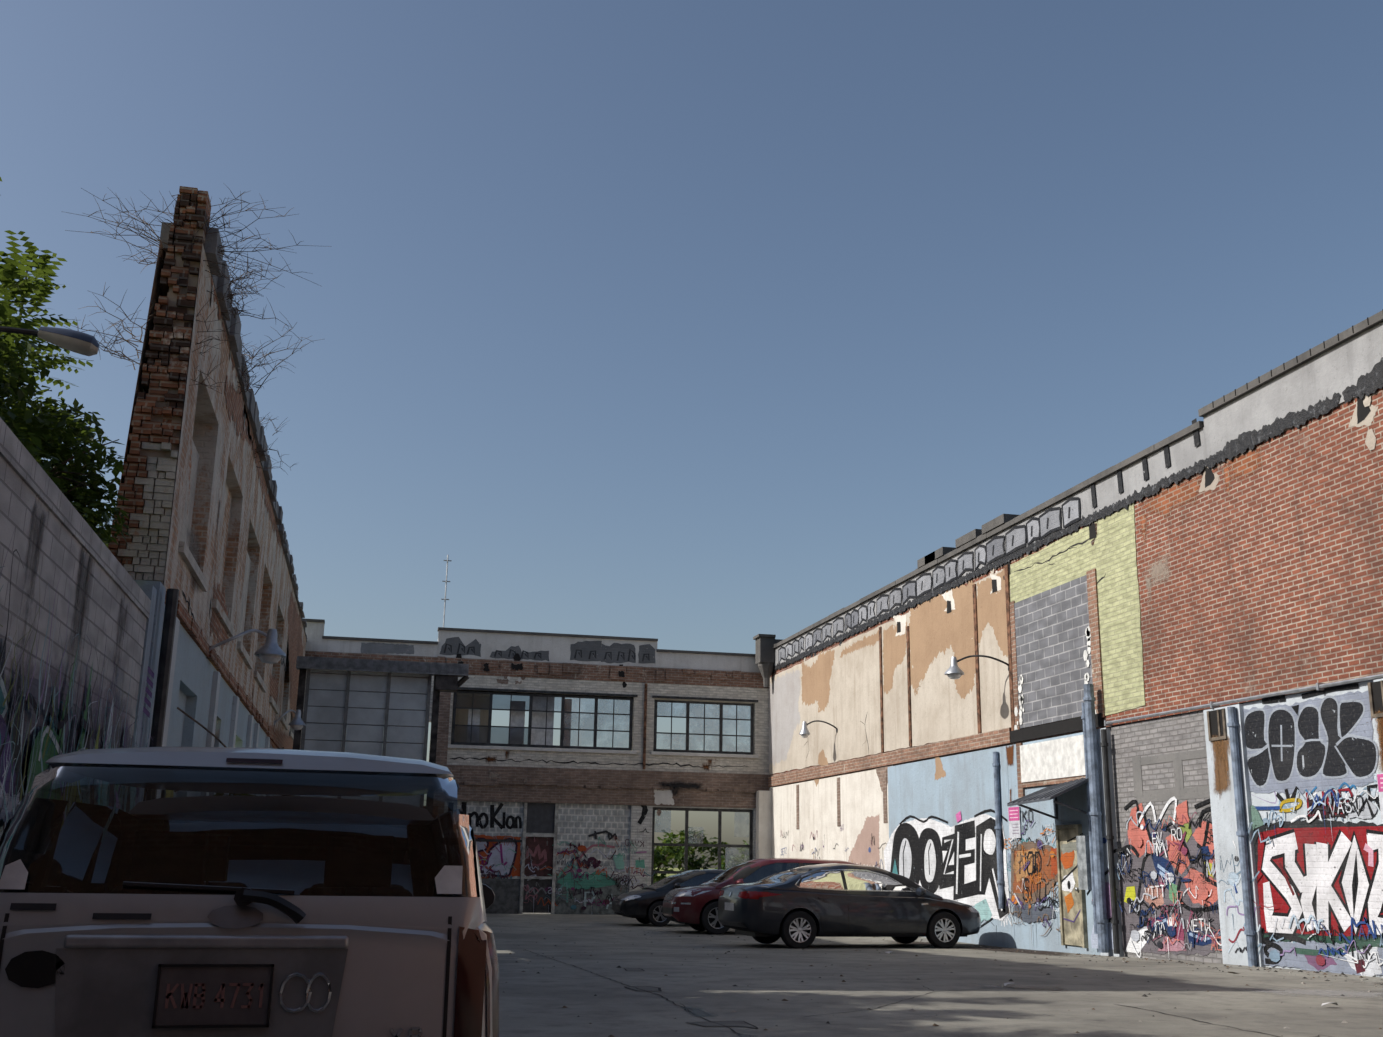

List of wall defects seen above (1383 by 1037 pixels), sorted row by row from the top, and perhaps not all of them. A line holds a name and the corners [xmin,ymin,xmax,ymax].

spalling [1348,393,1378,450]
spalling [235,562,1010,766]
peeling [935,756,946,780]